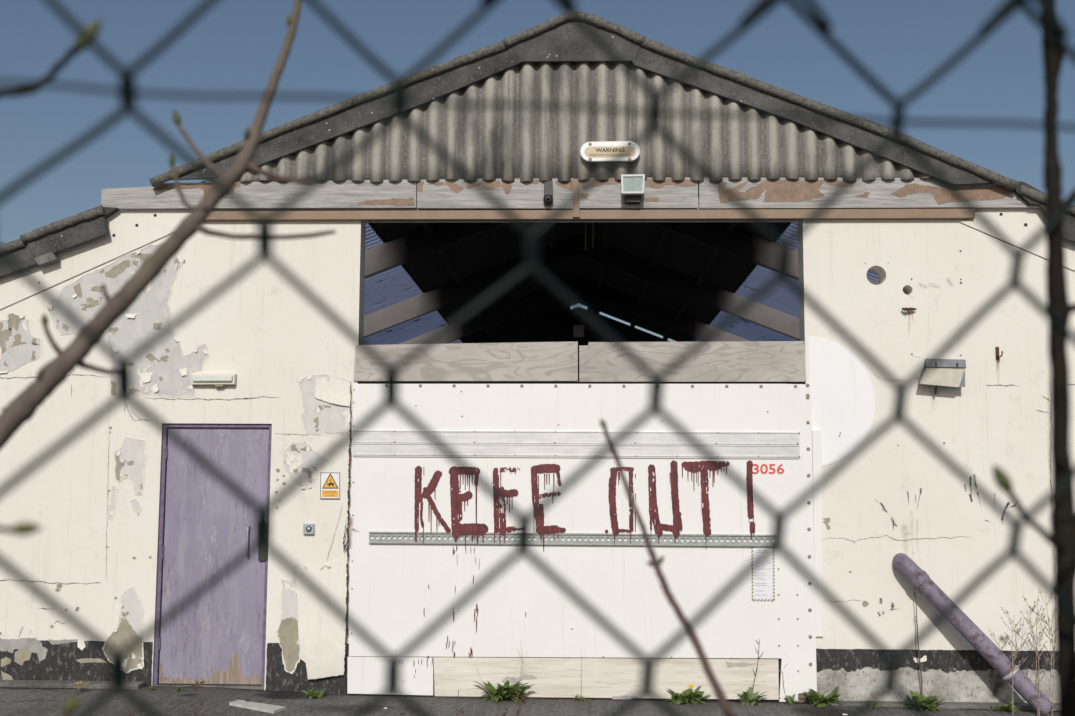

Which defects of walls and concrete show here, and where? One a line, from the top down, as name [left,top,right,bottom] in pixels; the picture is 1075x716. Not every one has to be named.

peeling [718,179,870,203]
peeling [891,183,1013,205]
peeling [0,312,43,373]
peeling [47,243,161,335]
peeling [106,254,210,398]
peeling [107,436,148,520]
peeling [275,373,353,494]
peeling [0,585,144,680]
peeling [276,564,300,674]